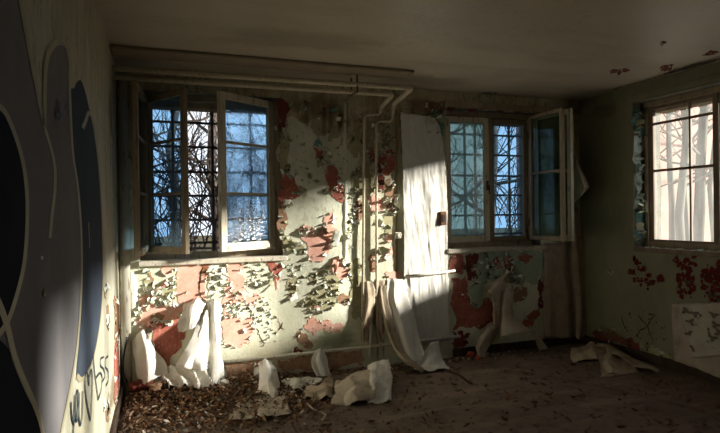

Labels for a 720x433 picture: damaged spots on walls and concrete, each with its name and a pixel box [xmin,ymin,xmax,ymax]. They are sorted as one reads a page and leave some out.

peeling [630,107,649,244]
peeling [133,98,399,380]
peeling [449,252,533,349]
peeling [522,276,544,328]
peeling [627,255,665,291]
peeling [672,255,720,303]